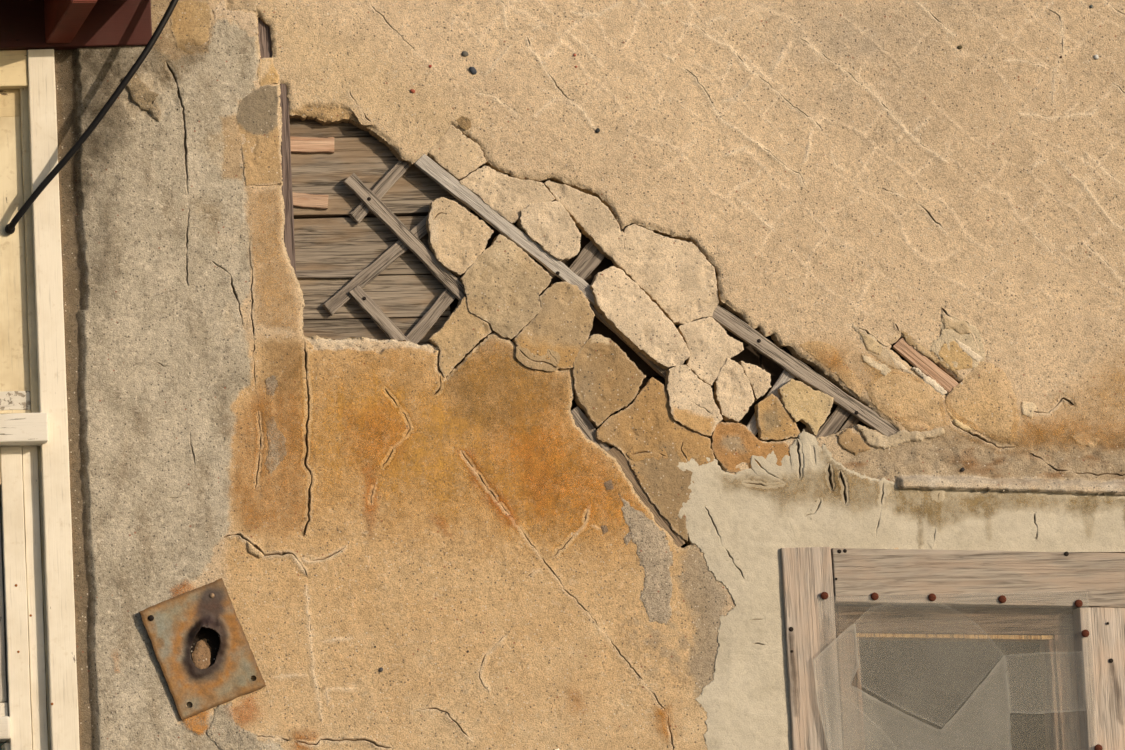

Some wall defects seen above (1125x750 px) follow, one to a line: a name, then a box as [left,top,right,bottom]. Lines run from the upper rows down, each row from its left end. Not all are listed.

crack [345,88,373,125]
crack [523,18,598,131]
crack [661,51,814,190]
crack [797,34,950,165]
crack [162,60,267,491]
crack [880,185,951,238]
crack [1029,150,1125,293]
spalling [852,314,986,395]
water stain [256,344,644,533]
peeling [836,409,974,455]
crack [223,338,448,750]
crack [458,450,679,750]